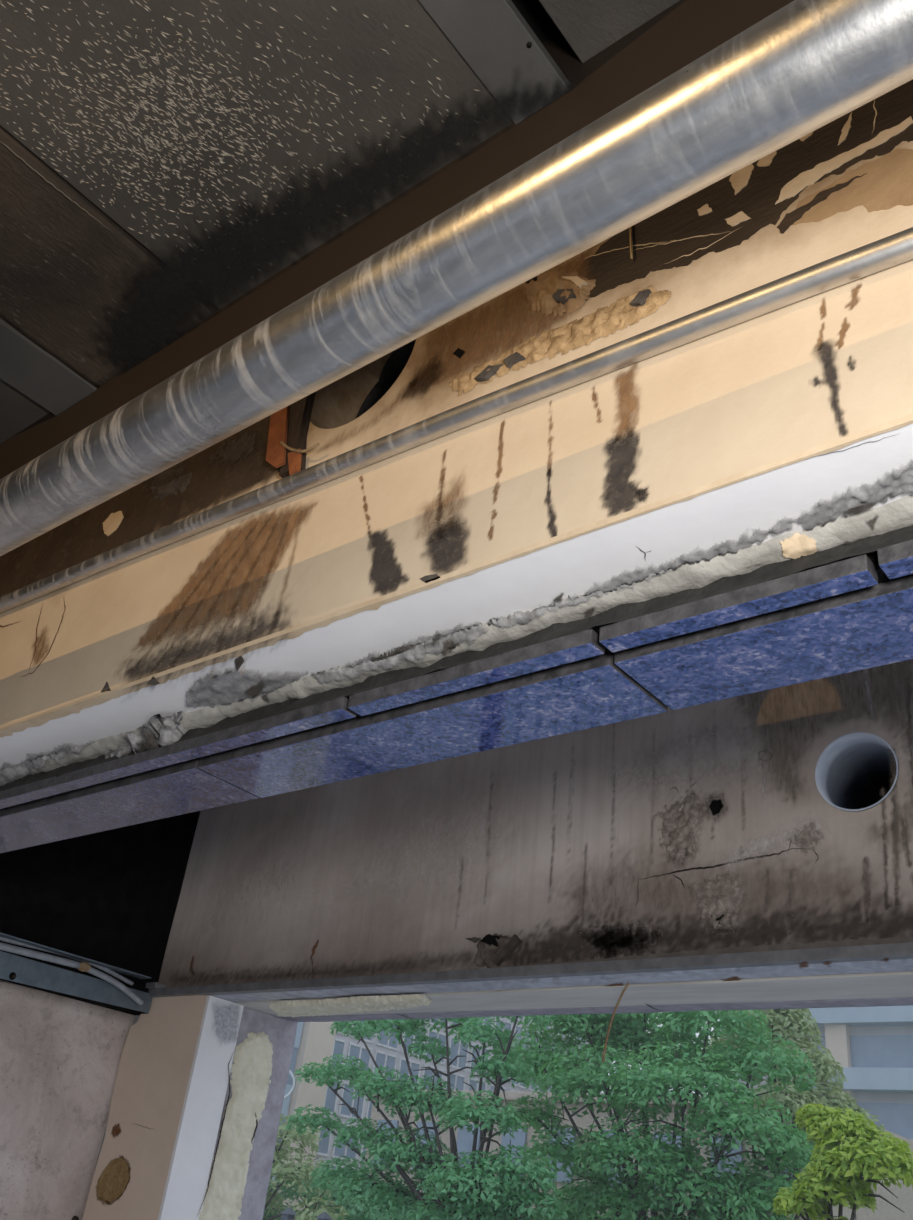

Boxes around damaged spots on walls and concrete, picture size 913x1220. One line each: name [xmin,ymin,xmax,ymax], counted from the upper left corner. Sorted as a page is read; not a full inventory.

peeling [449,79,913,396]
water stain [814,284,861,435]
water stain [360,476,408,595]
water stain [424,451,468,573]
water stain [488,421,504,539]
water stain [545,420,557,537]
water stain [603,366,648,515]
peeling [245,681,269,703]
peeling [371,645,414,662]
peeling [443,640,459,654]
crack [635,829,819,907]
flaking render [465,933,523,968]